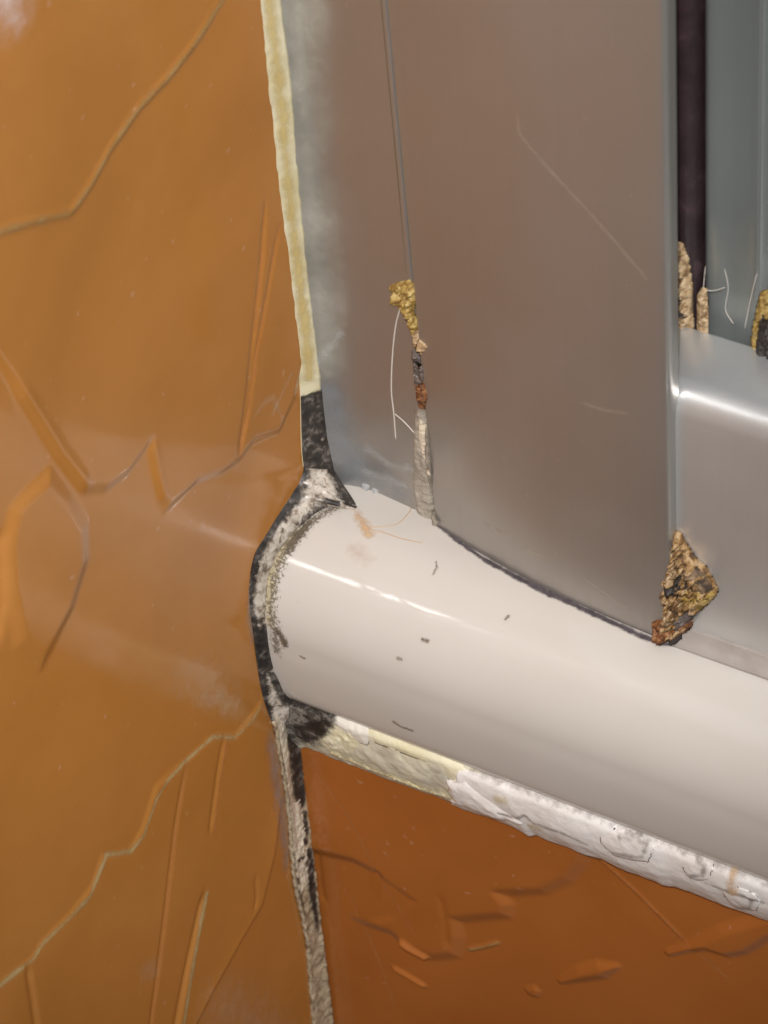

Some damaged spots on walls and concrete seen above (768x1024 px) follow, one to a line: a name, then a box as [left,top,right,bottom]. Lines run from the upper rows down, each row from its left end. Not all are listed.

crack [0,0,223,234]
water stain [249,0,357,932]
corrosion [651,530,719,646]
crack [0,714,257,987]